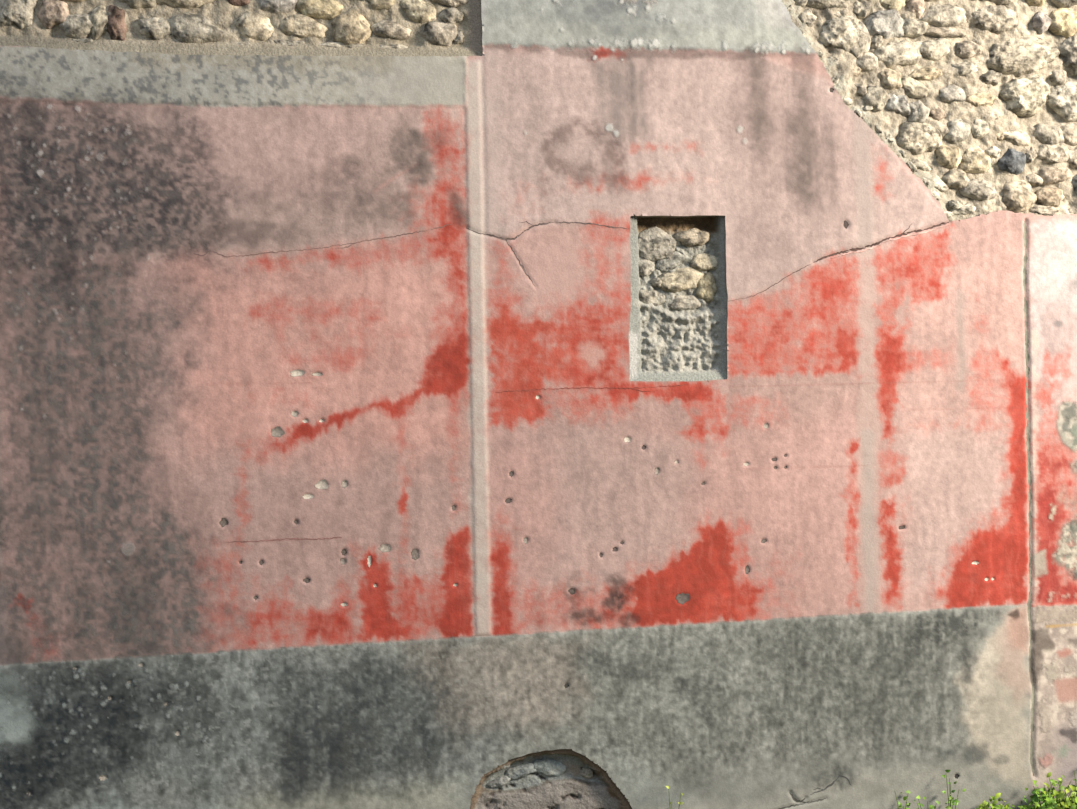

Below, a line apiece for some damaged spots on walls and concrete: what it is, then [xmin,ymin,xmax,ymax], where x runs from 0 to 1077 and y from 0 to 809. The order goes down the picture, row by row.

crack [194,221,626,287]
crack [731,222,950,301]
damp [0,265,201,661]
peeling [1032,520,1077,579]
damp [905,614,977,653]
efflorescence [0,685,34,743]
damp [281,660,444,792]
crack [779,775,851,809]